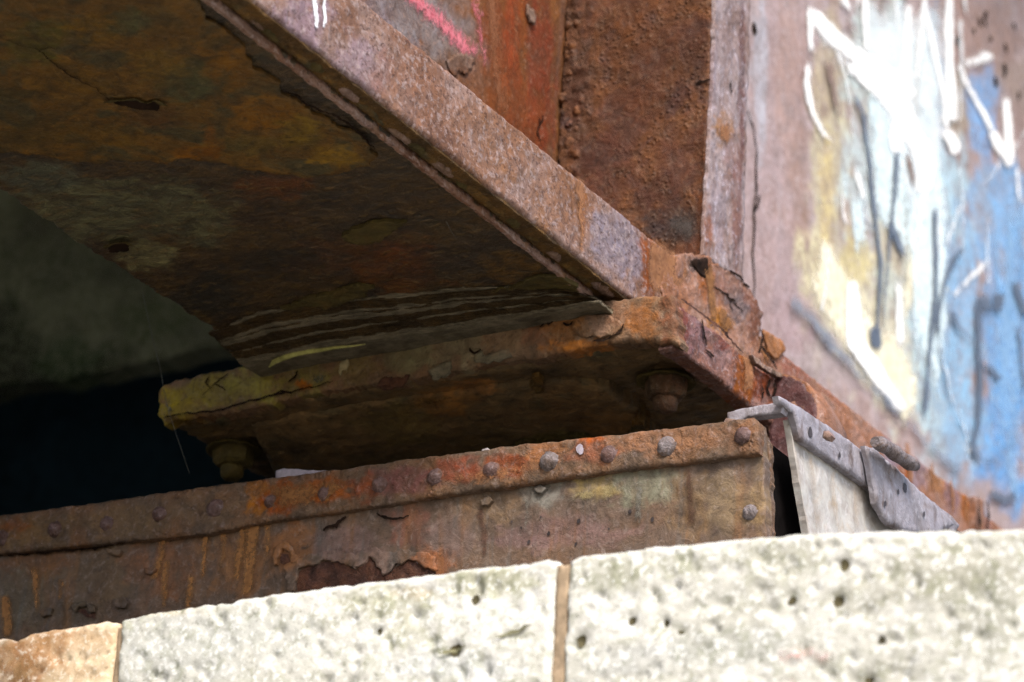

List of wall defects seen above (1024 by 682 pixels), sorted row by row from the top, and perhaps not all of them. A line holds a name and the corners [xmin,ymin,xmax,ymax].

hole [104,98,167,111]
crack [681,79,777,400]
rust [208,251,623,377]
rust [649,242,732,329]
rust [743,329,786,389]
rust [510,432,591,447]
rust [628,400,652,434]
rust [221,525,438,593]